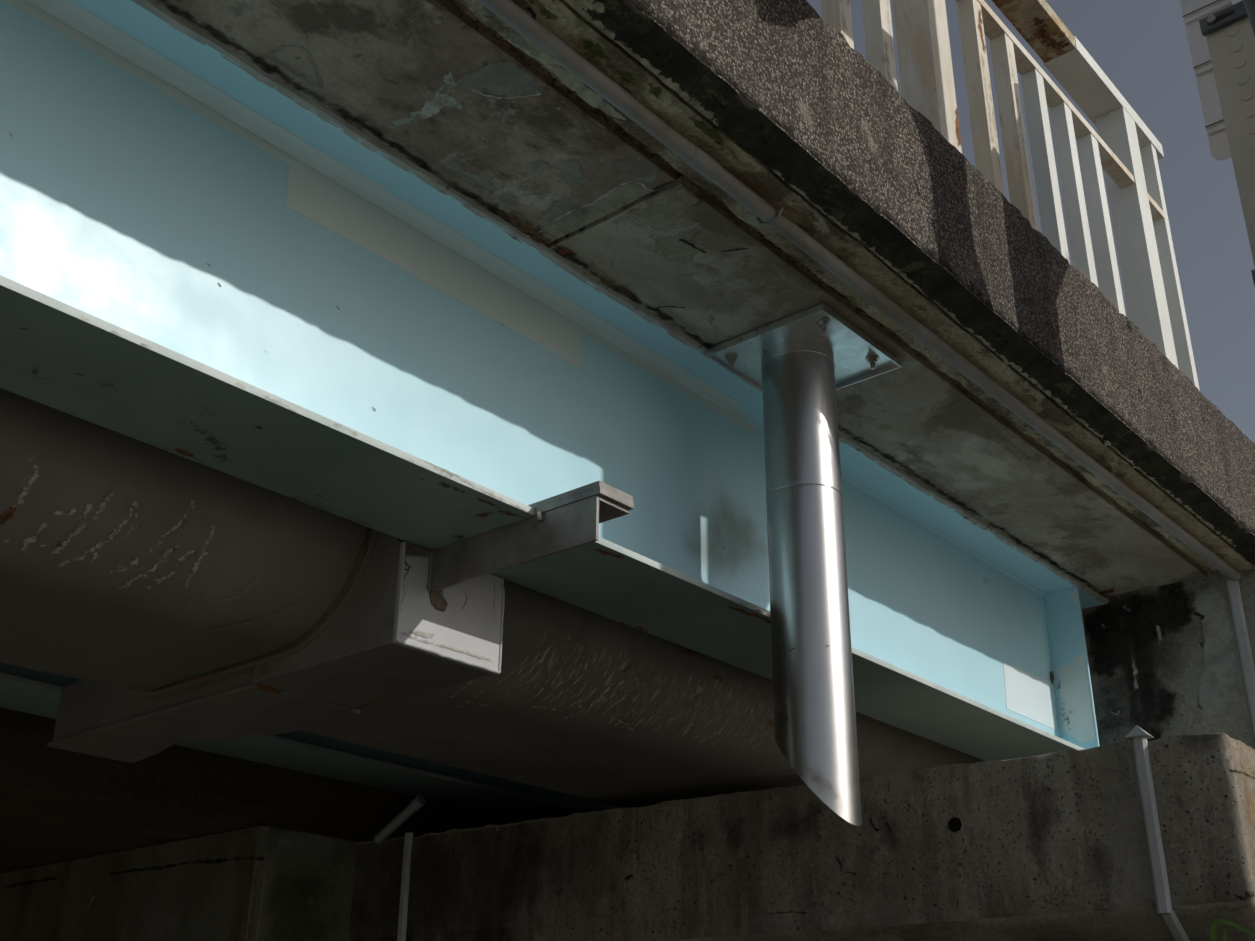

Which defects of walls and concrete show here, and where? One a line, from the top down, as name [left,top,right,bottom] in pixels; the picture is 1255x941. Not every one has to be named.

damp [161,0,323,100]
damp [392,72,462,126]
peeling [550,61,626,120]
peeling [564,0,718,126]
rust [1034,17,1070,51]
damp [346,116,713,348]
peeling [773,170,1236,546]
peeling [0,487,140,567]
peeling [110,499,215,589]
damp [838,427,1193,741]